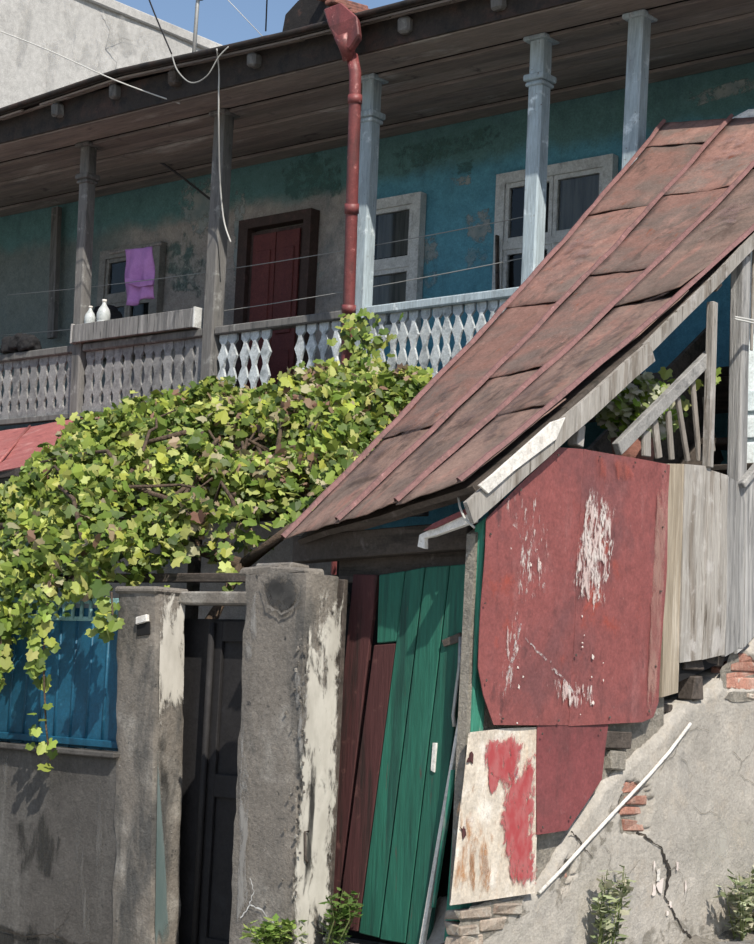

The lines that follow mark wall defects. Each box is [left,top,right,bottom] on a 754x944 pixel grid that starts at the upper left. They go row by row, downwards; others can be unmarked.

peeling [574,492,614,610]
peeling [159,595,185,714]
spalling [711,653,754,702]
leakage [0,925,66,944]
leakage [19,816,59,876]
peeling [237,769,248,919]
peeling [280,596,343,944]
crack [571,831,692,938]
spalling [618,781,647,835]